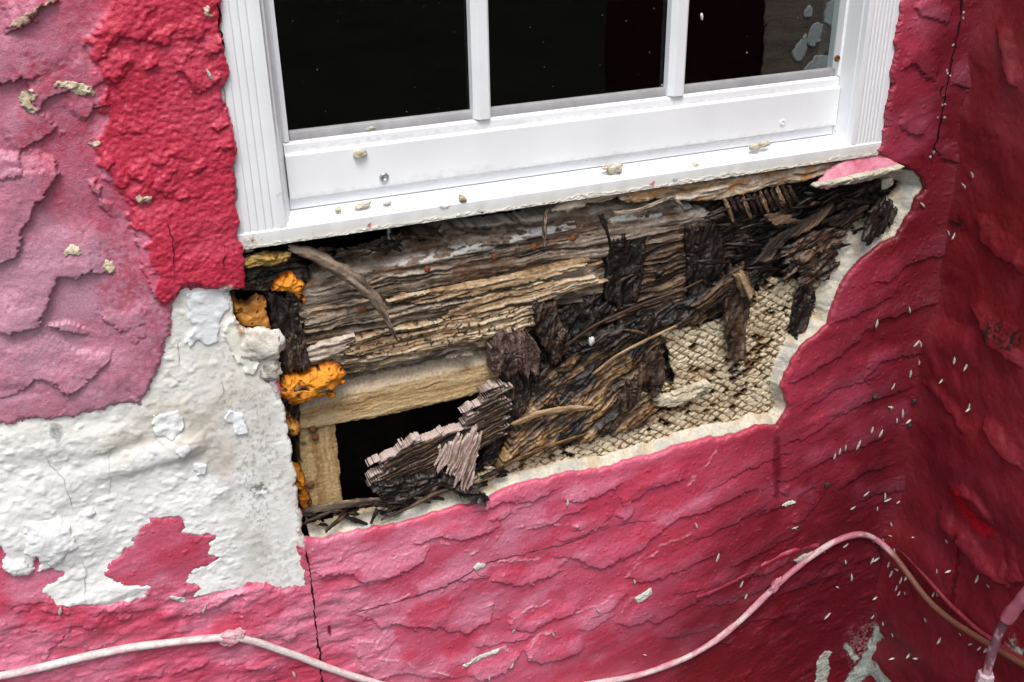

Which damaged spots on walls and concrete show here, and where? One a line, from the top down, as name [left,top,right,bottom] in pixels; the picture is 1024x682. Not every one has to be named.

spalling [8,0,54,28]
spalling [18,89,38,114]
spalling [53,81,95,97]
crack [923,0,964,163]
spalling [63,244,81,257]
spalling [102,260,116,274]
spalling [243,152,922,496]
peeling [0,287,480,607]
crack [305,549,324,682]